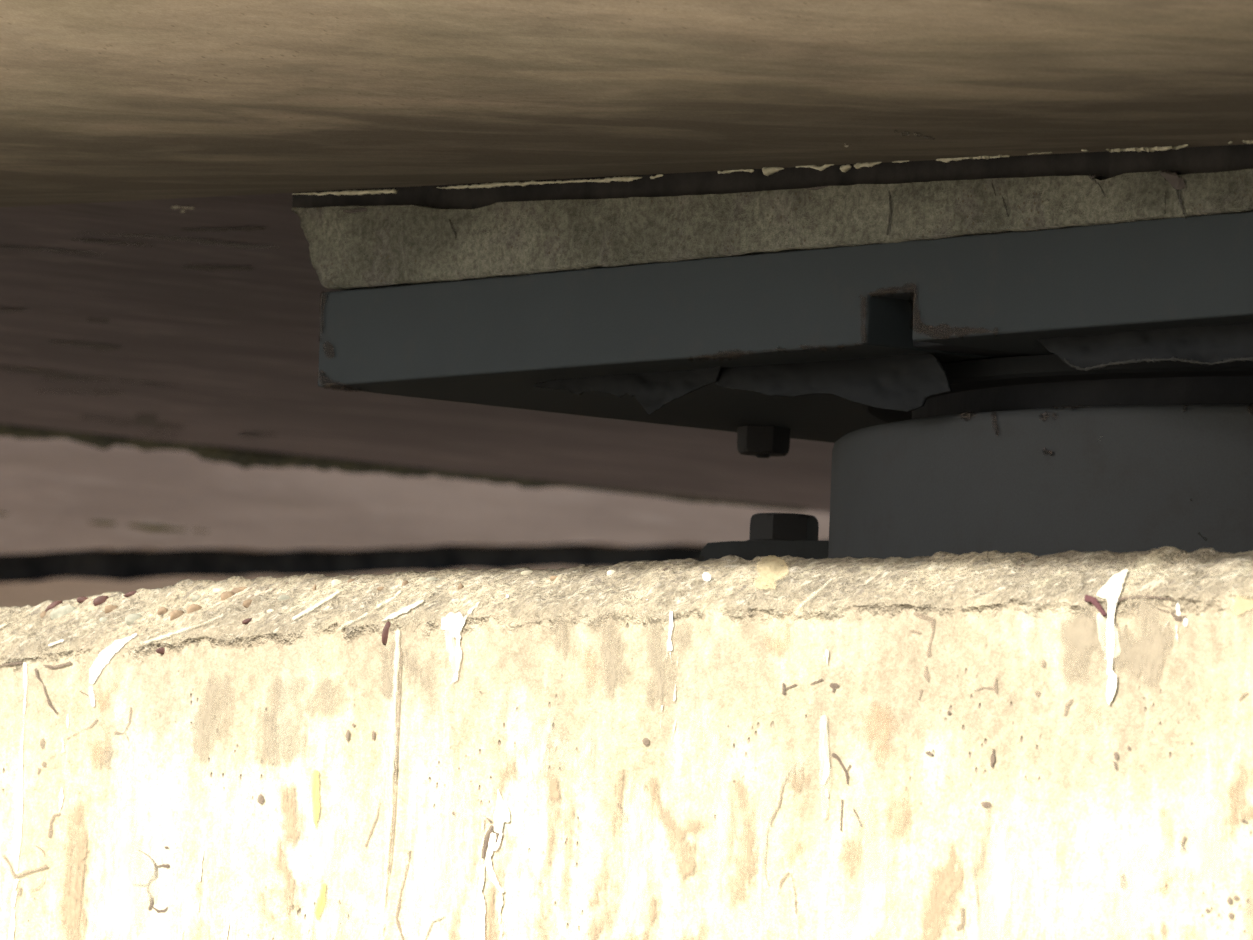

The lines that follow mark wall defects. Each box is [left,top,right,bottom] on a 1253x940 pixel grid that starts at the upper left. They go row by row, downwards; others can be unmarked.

peeling [1106,144,1188,153]
peeling [936,155,1010,163]
peeling [718,160,910,176]
peeling [437,174,663,189]
flaking render [1084,594,1106,617]